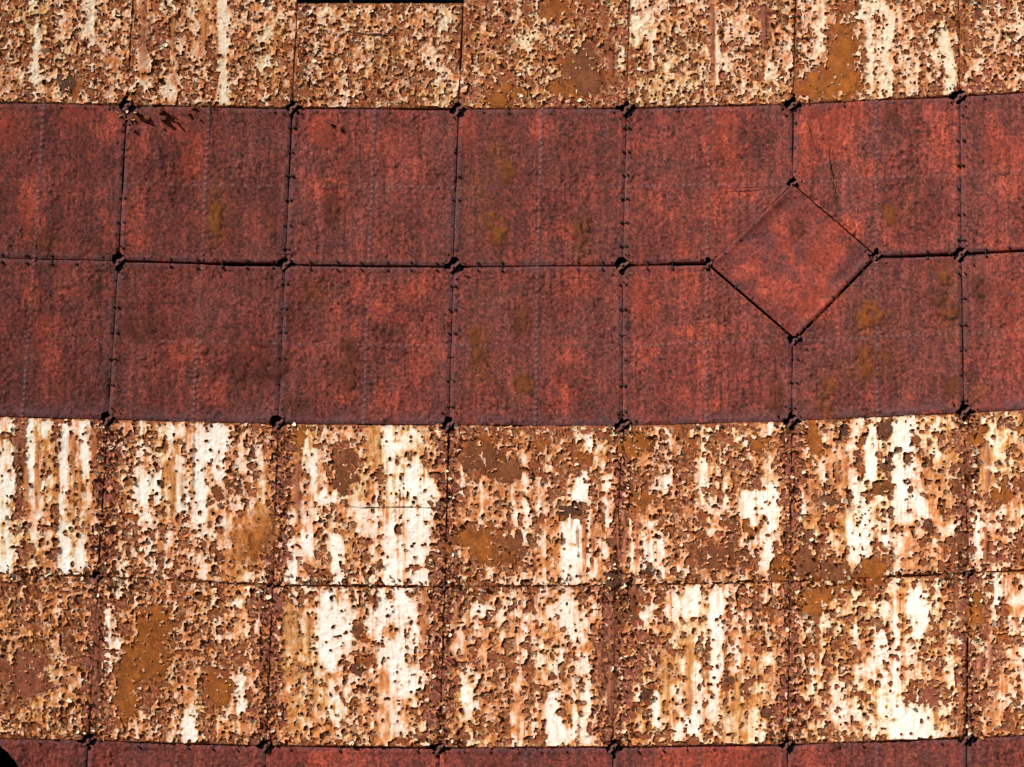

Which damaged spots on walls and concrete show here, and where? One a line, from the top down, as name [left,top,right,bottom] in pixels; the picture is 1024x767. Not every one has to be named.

peeling [0,0,1024,132]
corrosion [549,34,613,102]
corrosion [806,16,857,100]
corrosion [331,450,359,495]
corrosion [451,441,525,487]
corrosion [441,522,531,568]
peeling [0,398,1024,748]
corrosion [551,502,593,556]
corrosion [694,538,747,576]
corrosion [772,533,886,615]
corrosion [112,604,176,729]
corrosion [903,685,962,726]